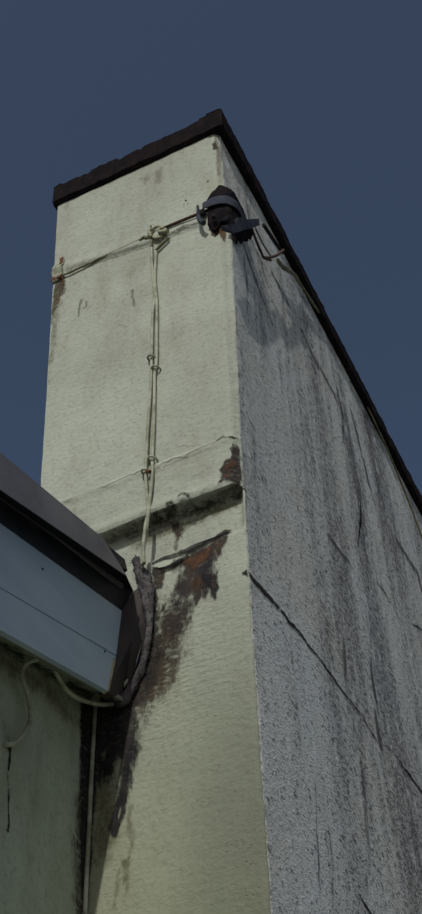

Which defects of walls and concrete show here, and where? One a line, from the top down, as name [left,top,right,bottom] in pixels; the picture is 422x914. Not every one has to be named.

leakage [301,329,375,504]
leakage [104,483,242,541]
crack [327,502,362,566]
leakage [0,597,166,914]
crack [242,570,422,793]